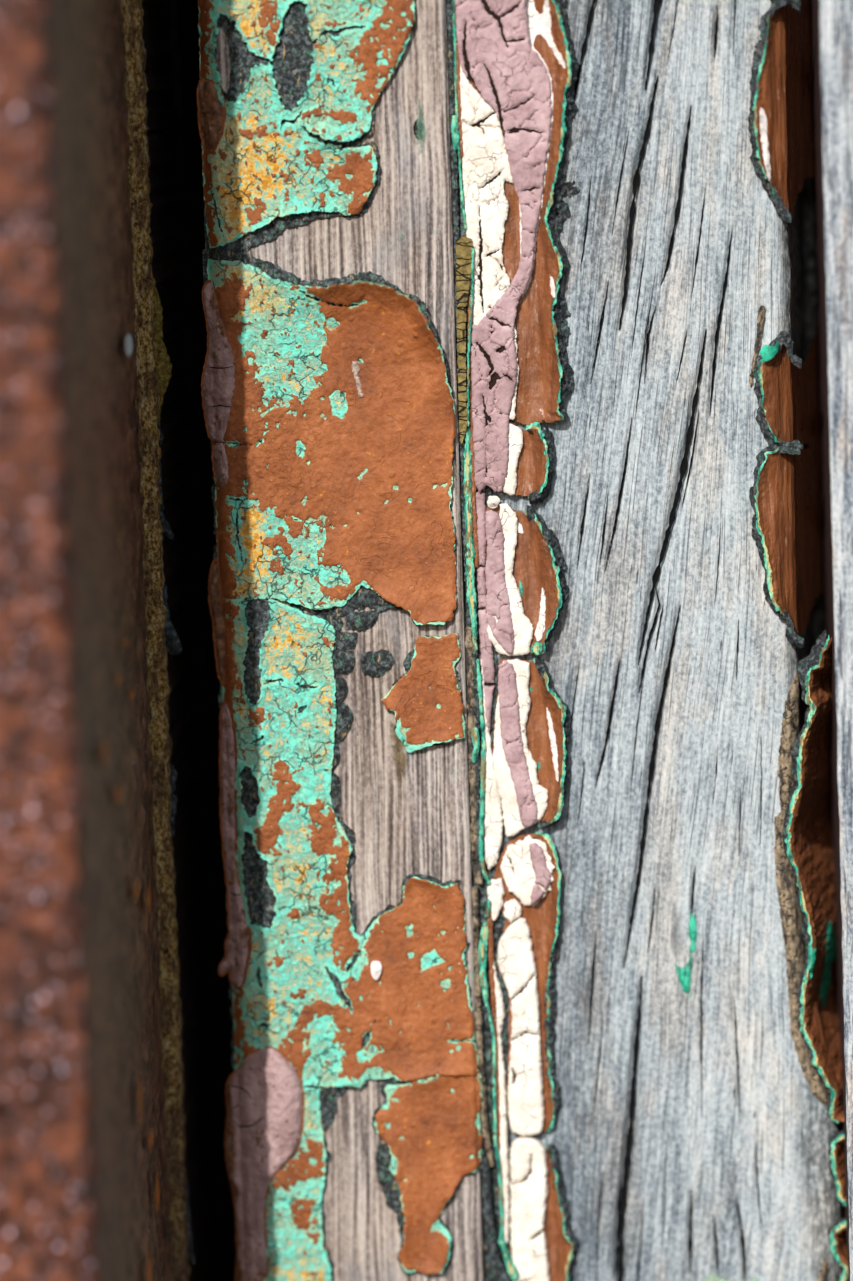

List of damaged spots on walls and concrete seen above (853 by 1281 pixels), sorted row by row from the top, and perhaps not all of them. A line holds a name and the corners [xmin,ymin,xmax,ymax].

peeling [760,341,779,361]
peeling [198,0,484,1281]
crack [574,0,762,1281]
crack [569,666,579,735]
peeling [810,921,837,1009]